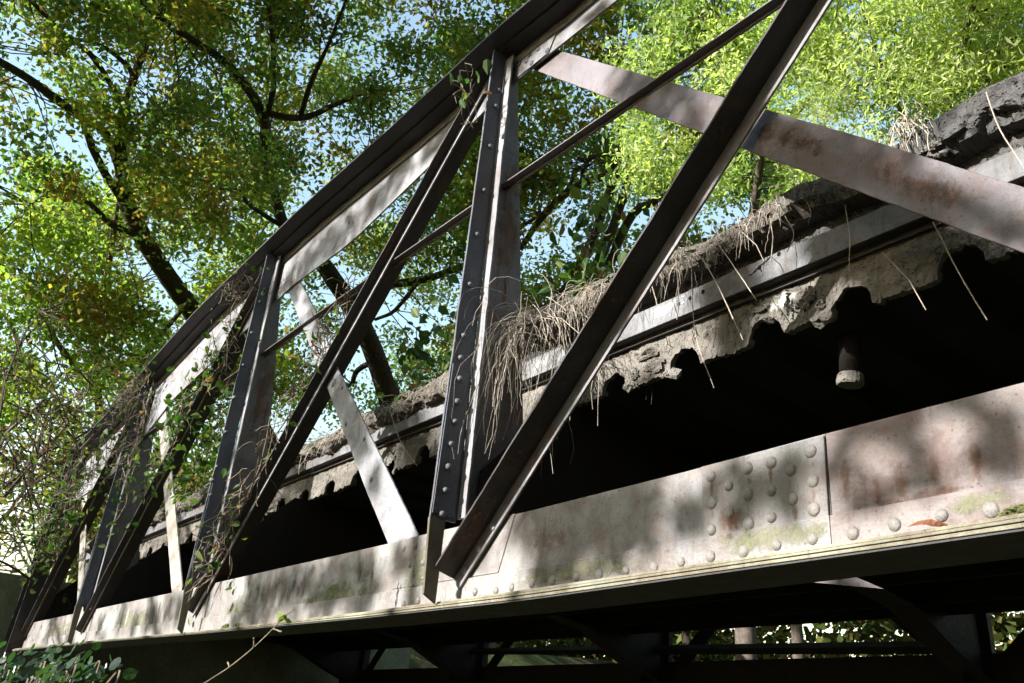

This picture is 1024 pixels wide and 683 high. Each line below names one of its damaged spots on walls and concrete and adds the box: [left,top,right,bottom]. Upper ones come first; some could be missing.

peeling [652,296,685,318]
spalling [812,299,834,329]
spalling [623,357,682,393]
corrosion [723,512,748,531]